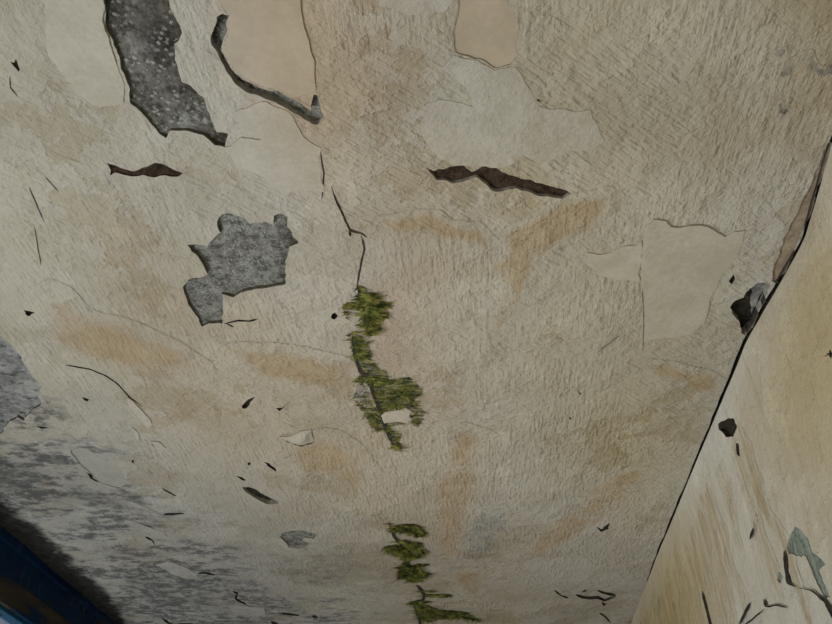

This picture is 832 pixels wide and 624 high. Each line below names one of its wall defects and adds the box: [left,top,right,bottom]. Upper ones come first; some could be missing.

spalling [42,0,325,195]
peeling [378,0,604,198]
crack [320,151,368,285]
spalling [183,213,299,326]
flaking render [0,336,41,434]
water stain [32,278,216,380]
water stain [218,341,362,398]
water stain [0,464,170,624]
water stain [137,555,322,621]
crack [702,593,711,624]
crack [739,599,787,624]
crack [783,551,832,618]